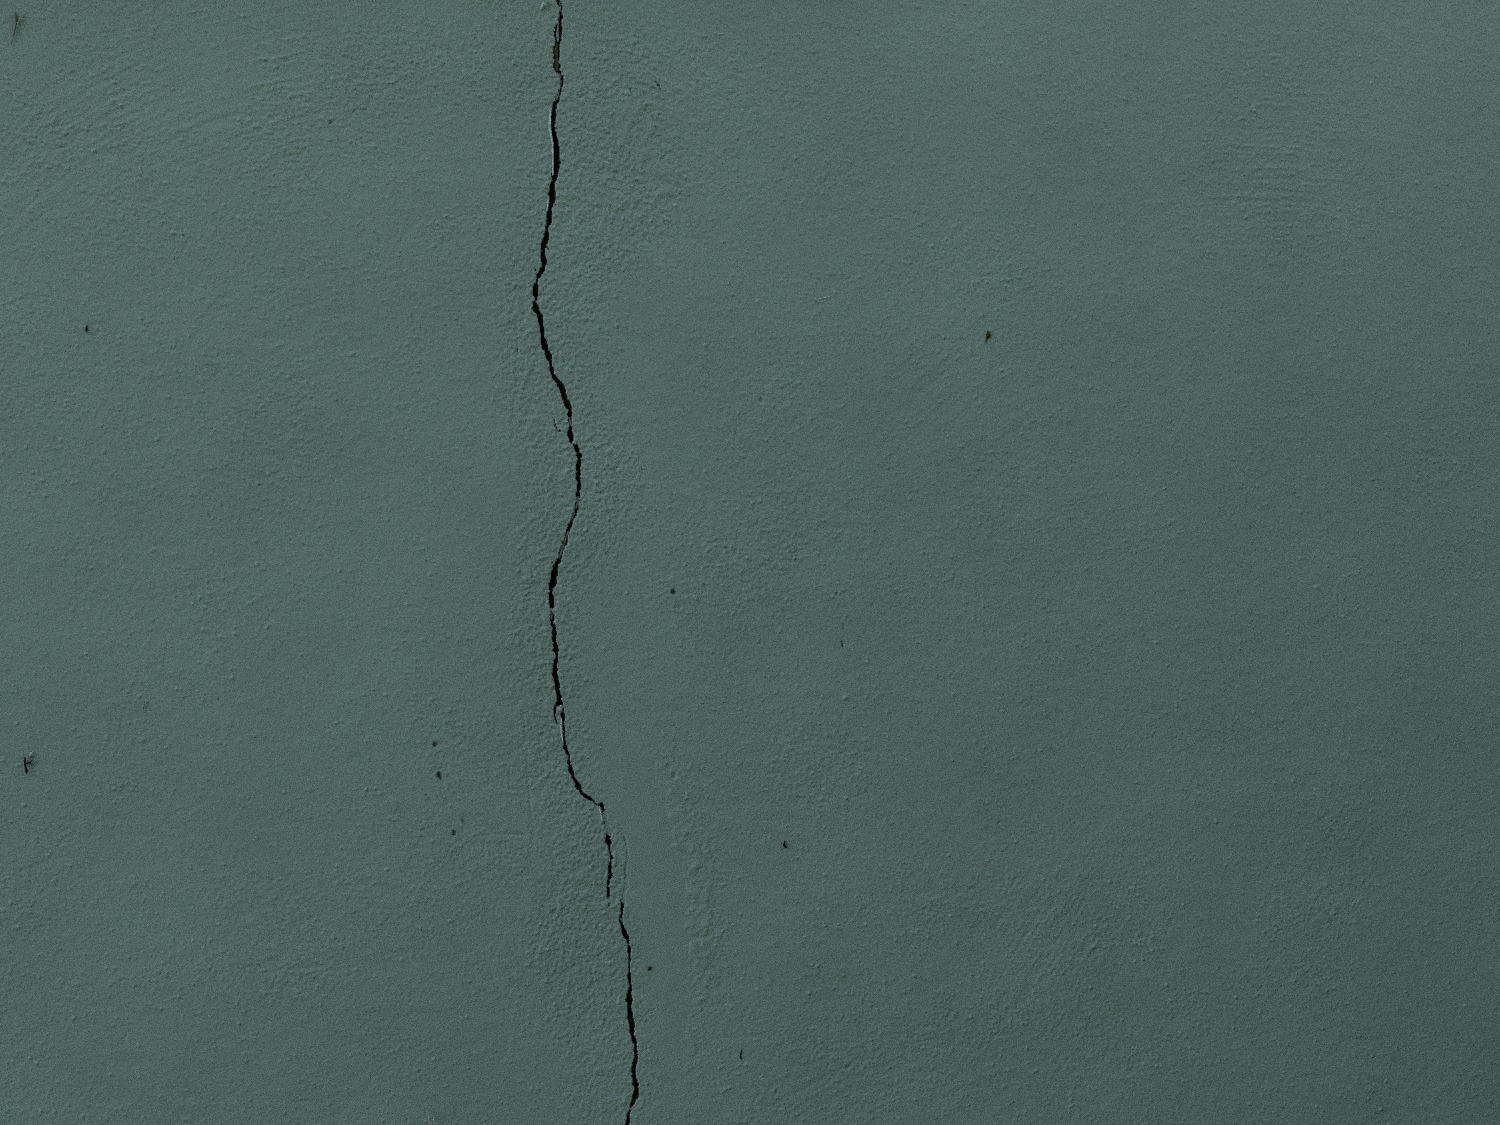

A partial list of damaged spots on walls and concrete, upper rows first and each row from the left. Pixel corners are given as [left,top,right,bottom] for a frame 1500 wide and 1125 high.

crack [517,0,639,1125]